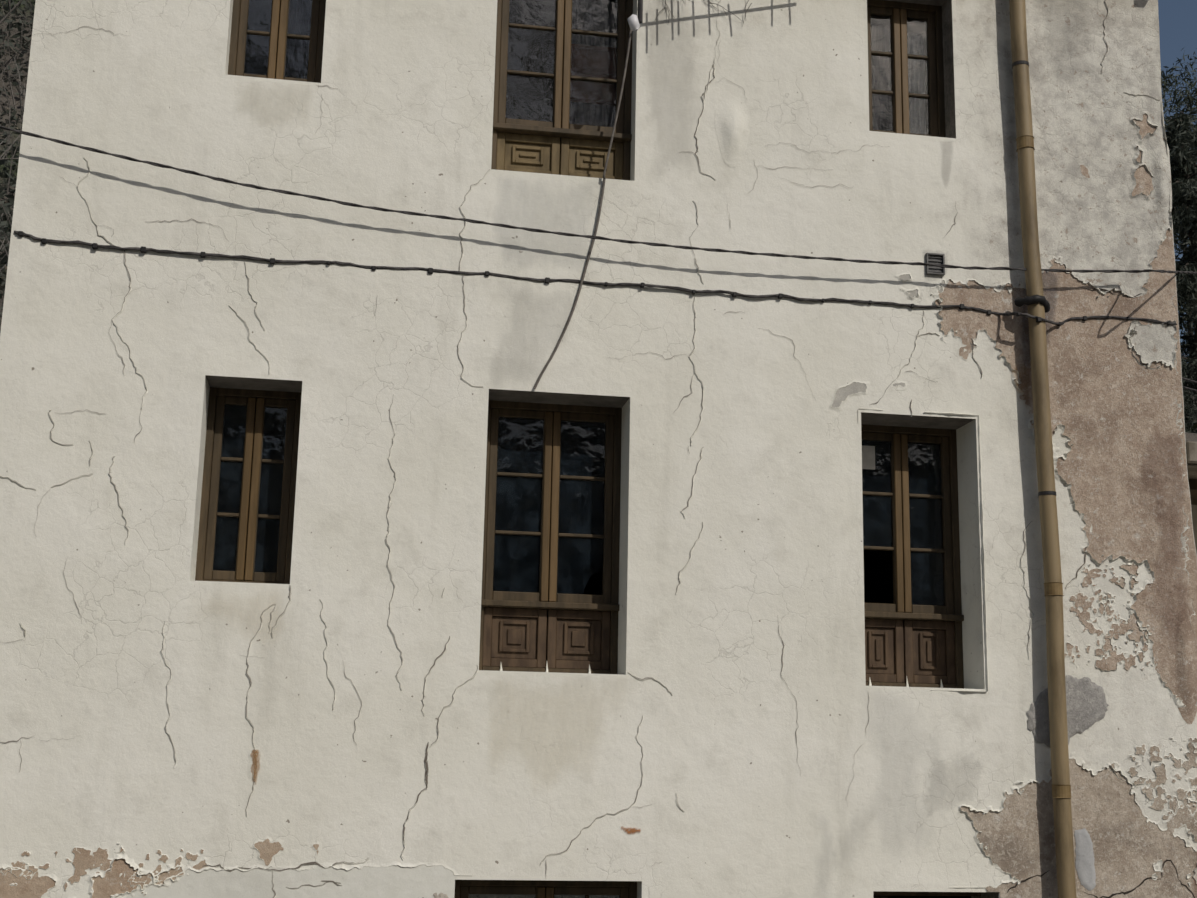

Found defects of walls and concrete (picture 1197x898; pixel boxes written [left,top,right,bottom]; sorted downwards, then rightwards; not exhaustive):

flaking render [1128,103,1168,201]
crack [0,158,148,545]
crack [615,0,747,595]
flaking render [894,271,1036,454]
flaking render [1041,195,1197,708]
crack [241,585,362,817]
crack [384,394,479,861]
flaking render [0,836,217,898]
crack [204,858,369,898]
flaking render [957,758,1058,898]
flaking render [1069,737,1197,898]
crack [1089,860,1195,898]